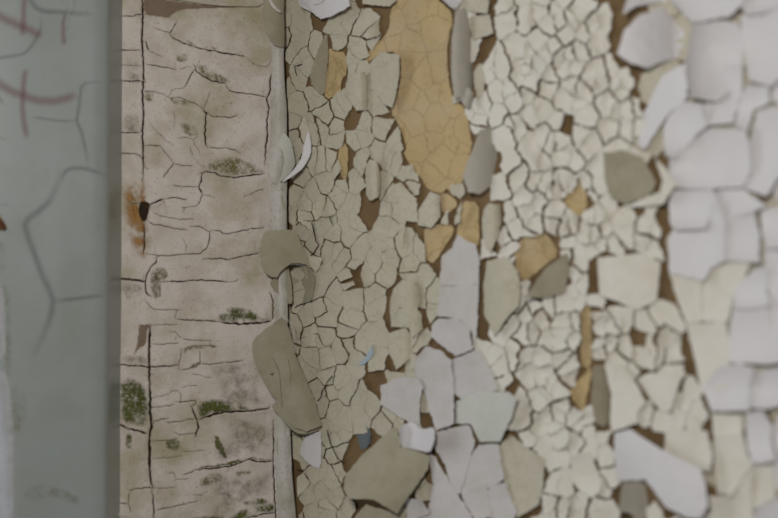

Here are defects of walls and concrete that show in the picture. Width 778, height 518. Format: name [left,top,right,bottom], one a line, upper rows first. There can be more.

peeling [299,0,350,19]
rust [126,191,148,246]
crack [120,0,450,518]
peeling [324,0,569,518]
peeling [560,179,587,216]
peeling [569,0,778,518]
peeling [0,371,14,518]
peeling [300,432,322,468]